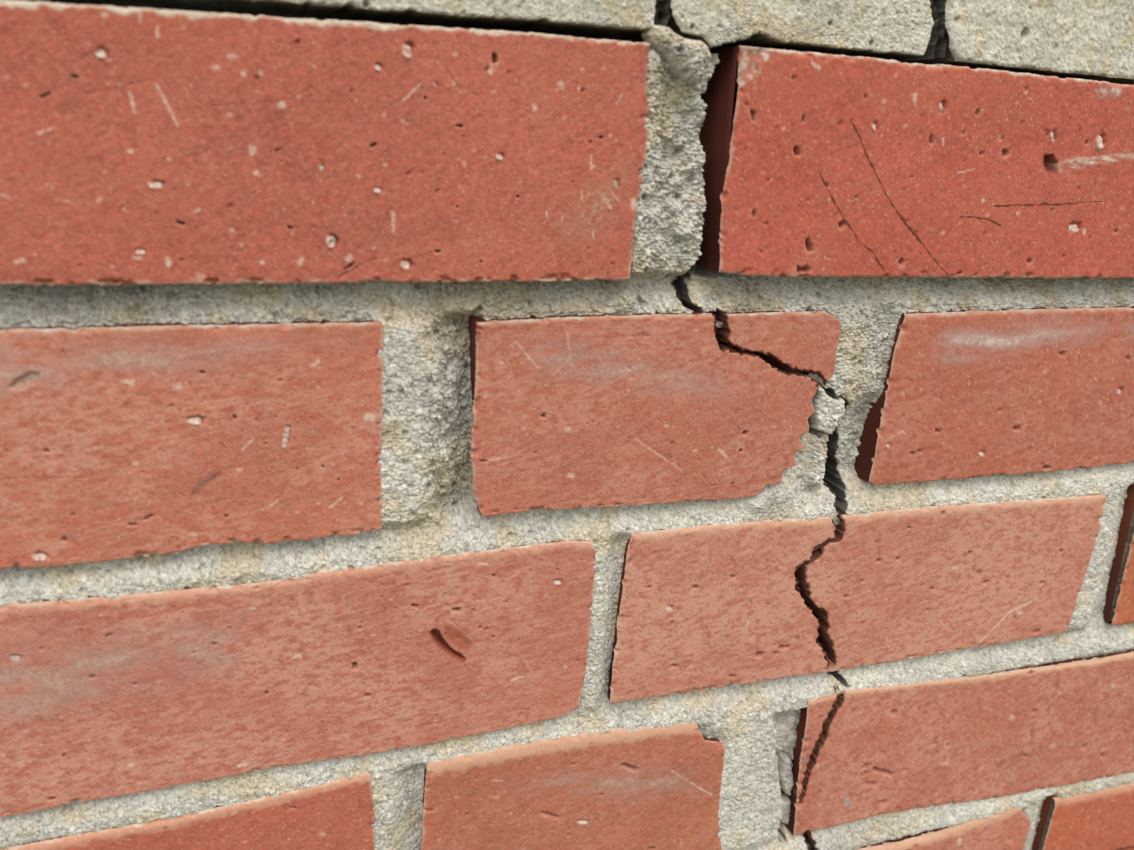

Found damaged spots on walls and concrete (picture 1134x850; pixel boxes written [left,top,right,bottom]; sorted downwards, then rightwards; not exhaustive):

crack [641,0,670,31]
crack [671,262,848,850]